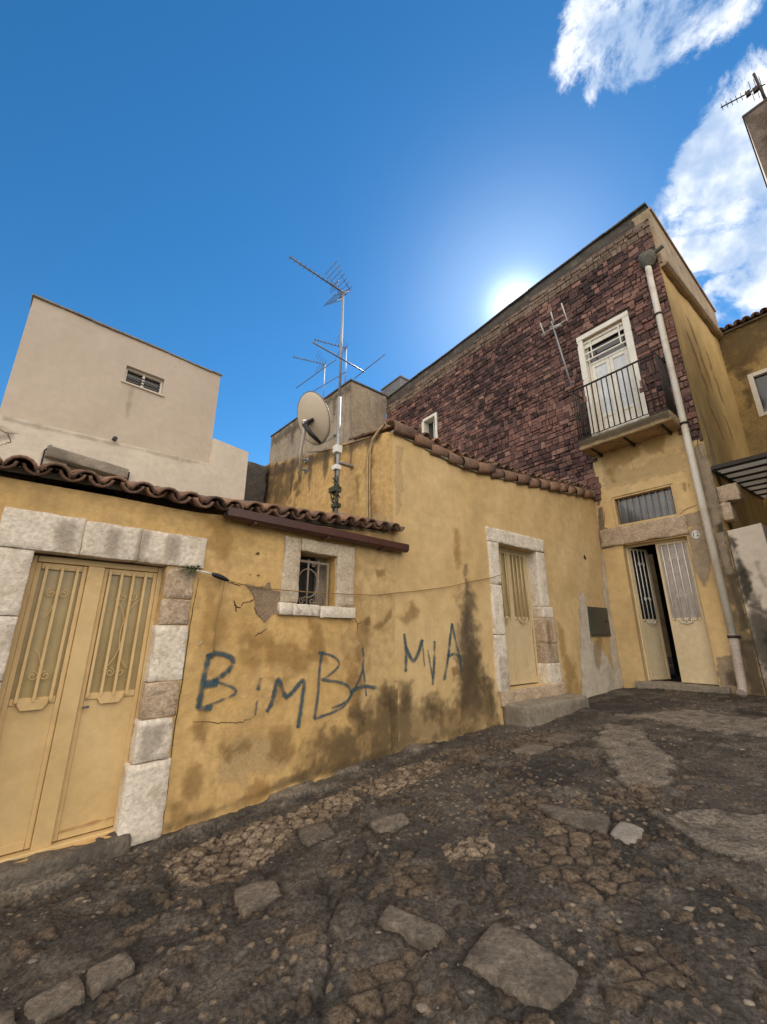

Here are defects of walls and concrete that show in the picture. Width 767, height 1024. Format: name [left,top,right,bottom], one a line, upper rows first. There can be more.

spalling [597,500,608,530]
crack [163,579,253,820]
spalling [241,574,280,623]
water stain [276,594,499,787]
peeling [579,546,623,698]